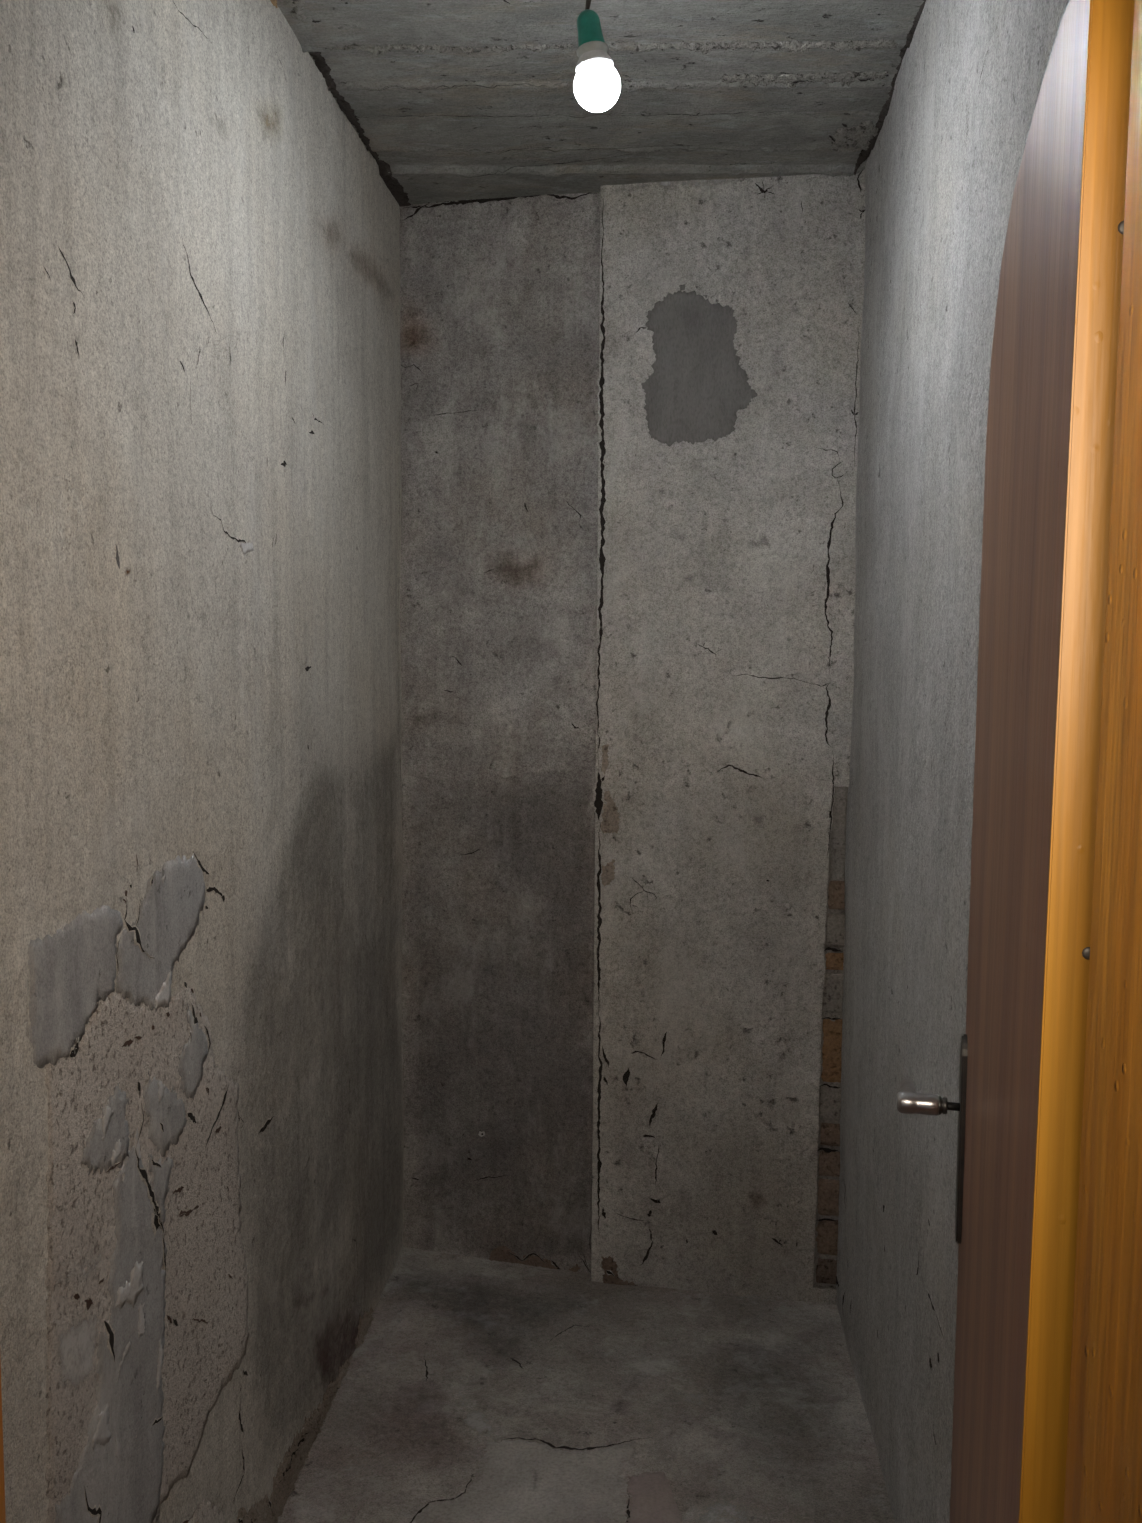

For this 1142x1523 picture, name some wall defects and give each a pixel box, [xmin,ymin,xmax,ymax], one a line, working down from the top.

crack [355,48,733,1265]
peeling [635,285,757,447]
crack [698,300,859,858]
crack [856,170,865,219]
spalling [44,971,249,1523]